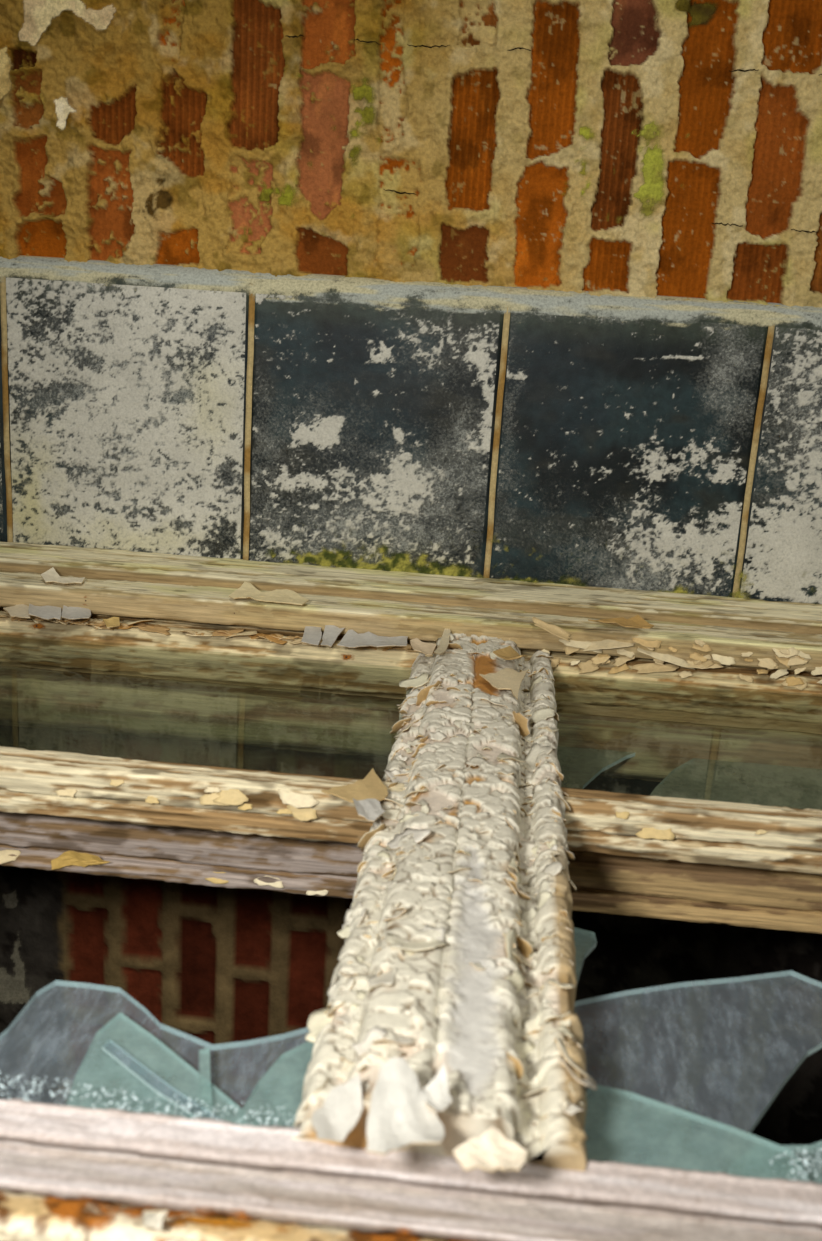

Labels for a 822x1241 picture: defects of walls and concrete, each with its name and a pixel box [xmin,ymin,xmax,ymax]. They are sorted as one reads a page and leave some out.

damp [0,255,822,604]
peeling [0,604,822,1172]
corrosion [44,1195,252,1241]
peeling [142,1210,191,1241]
corrosion [348,1229,421,1241]